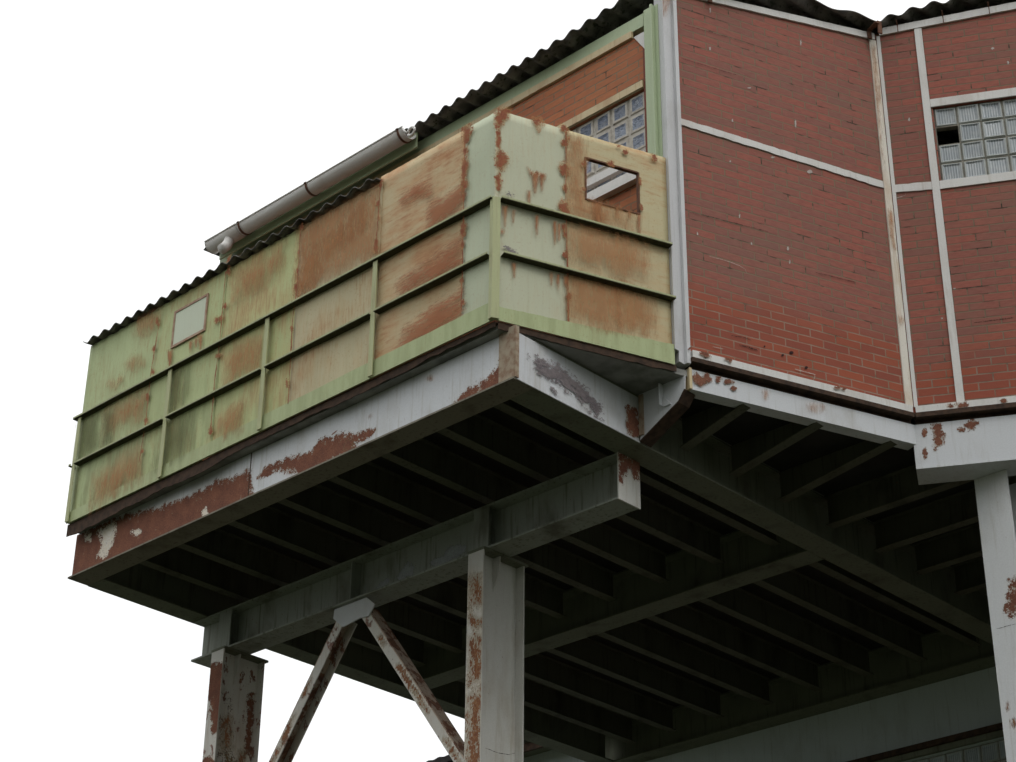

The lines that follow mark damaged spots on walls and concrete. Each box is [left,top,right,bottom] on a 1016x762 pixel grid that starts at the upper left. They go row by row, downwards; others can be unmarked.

corrosion [493,107,511,191]
corrosion [294,180,382,299]
corrosion [551,125,649,331]
peeling [529,354,604,421]
corrosion [692,372,737,391]
corrosion [921,422,946,459]
peeling [84,520,117,560]
corrosion [72,428,376,575]
corrosion [1003,576,1016,619]
corrosion [208,662,232,750]
corrosion [269,716,294,762]
corrosion [445,574,482,762]